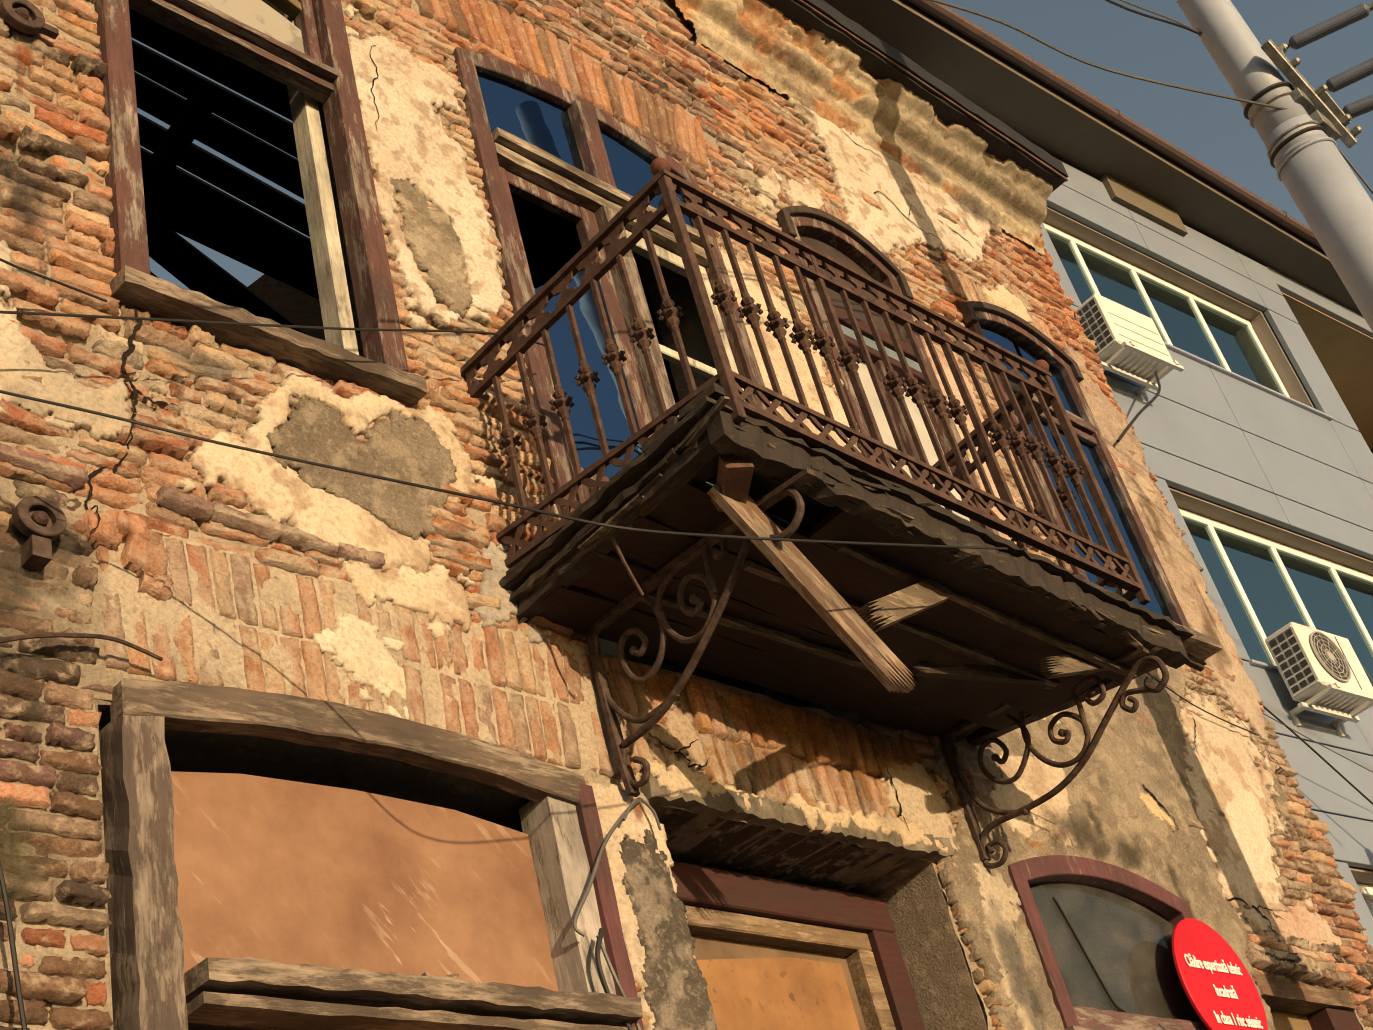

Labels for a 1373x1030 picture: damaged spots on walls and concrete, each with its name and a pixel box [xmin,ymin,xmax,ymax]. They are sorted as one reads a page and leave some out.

peeling [743,94,992,265]
peeling [981,284,1033,323]
crack [84,308,178,534]
peeling [176,369,549,720]
crack [649,734,710,768]
peeling [785,761,960,853]
peeling [1175,689,1357,953]
spalling [1357,964,1373,1027]